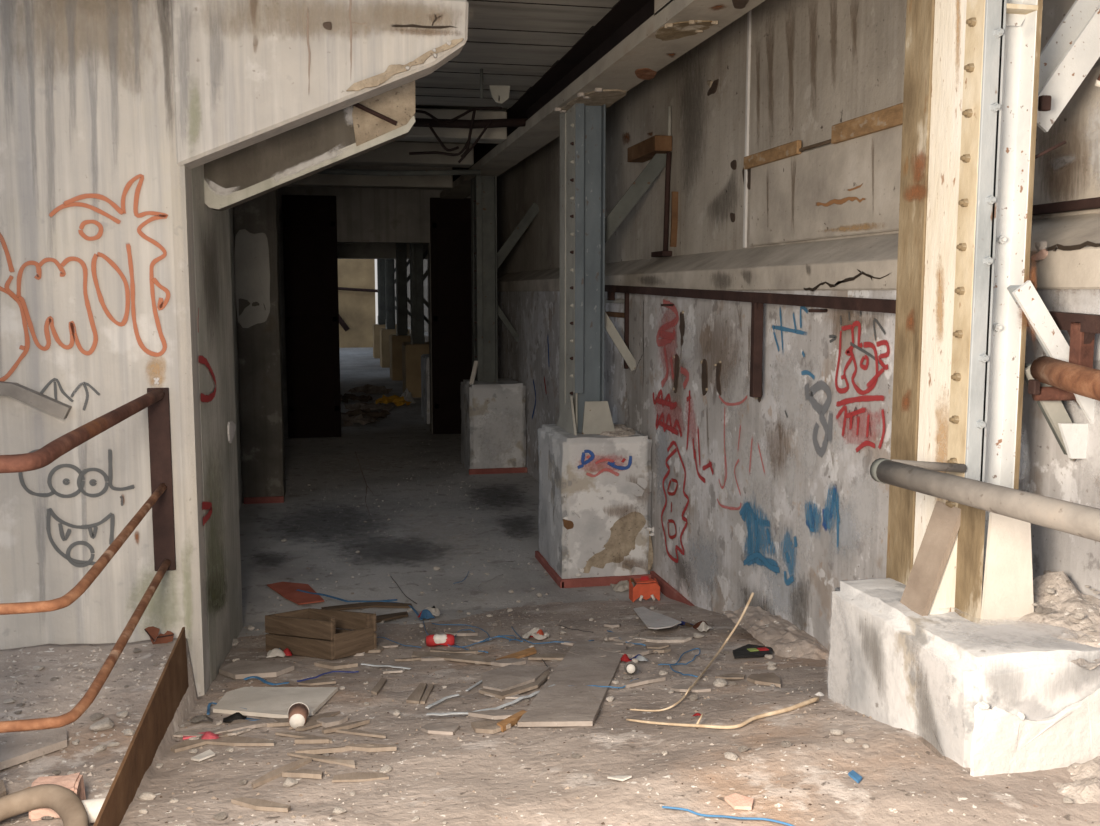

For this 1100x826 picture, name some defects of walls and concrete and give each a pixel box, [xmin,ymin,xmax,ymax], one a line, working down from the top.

spalling [346,38,464,91]
peeling [210,181,234,195]
peeling [275,148,338,178]
rust [906,153,926,200]
crack [1046,241,1100,251]
crack [804,269,890,291]
peeling [575,512,654,577]
peeling [970,688,1100,777]